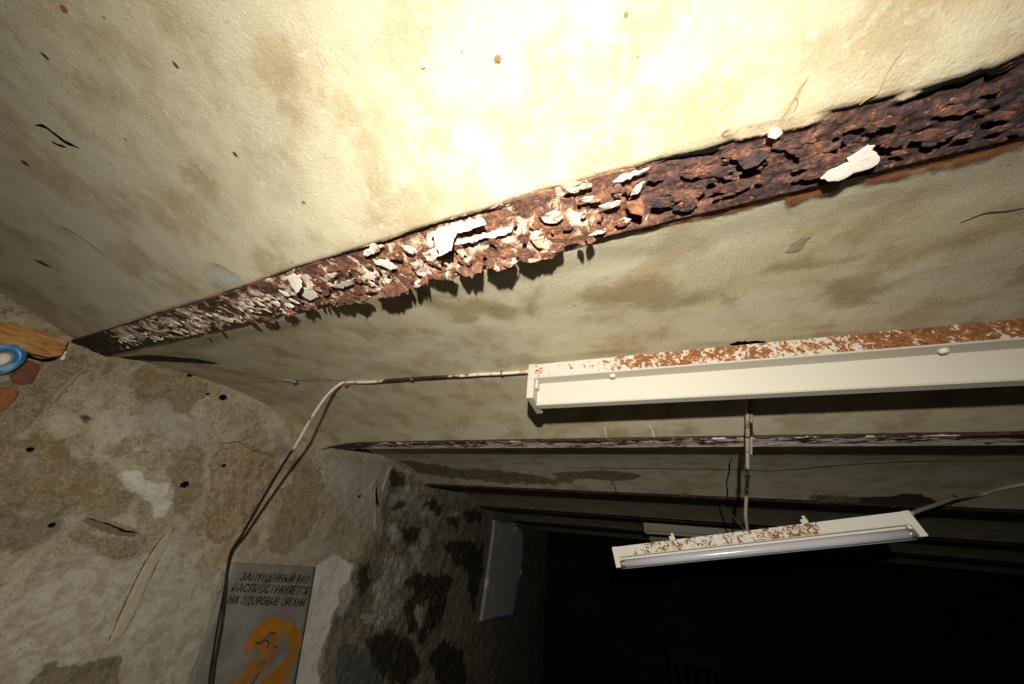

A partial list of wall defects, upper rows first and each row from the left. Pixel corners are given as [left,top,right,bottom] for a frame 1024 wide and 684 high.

peeling [821,145,880,181]
peeling [402,217,513,277]
peeling [541,211,563,223]
peeling [561,168,649,236]
corrosion [248,87,1024,323]
peeling [787,237,810,253]
spalling [82,515,142,537]
peeling [115,469,189,519]
damp [129,364,492,684]
peeling [0,527,225,684]